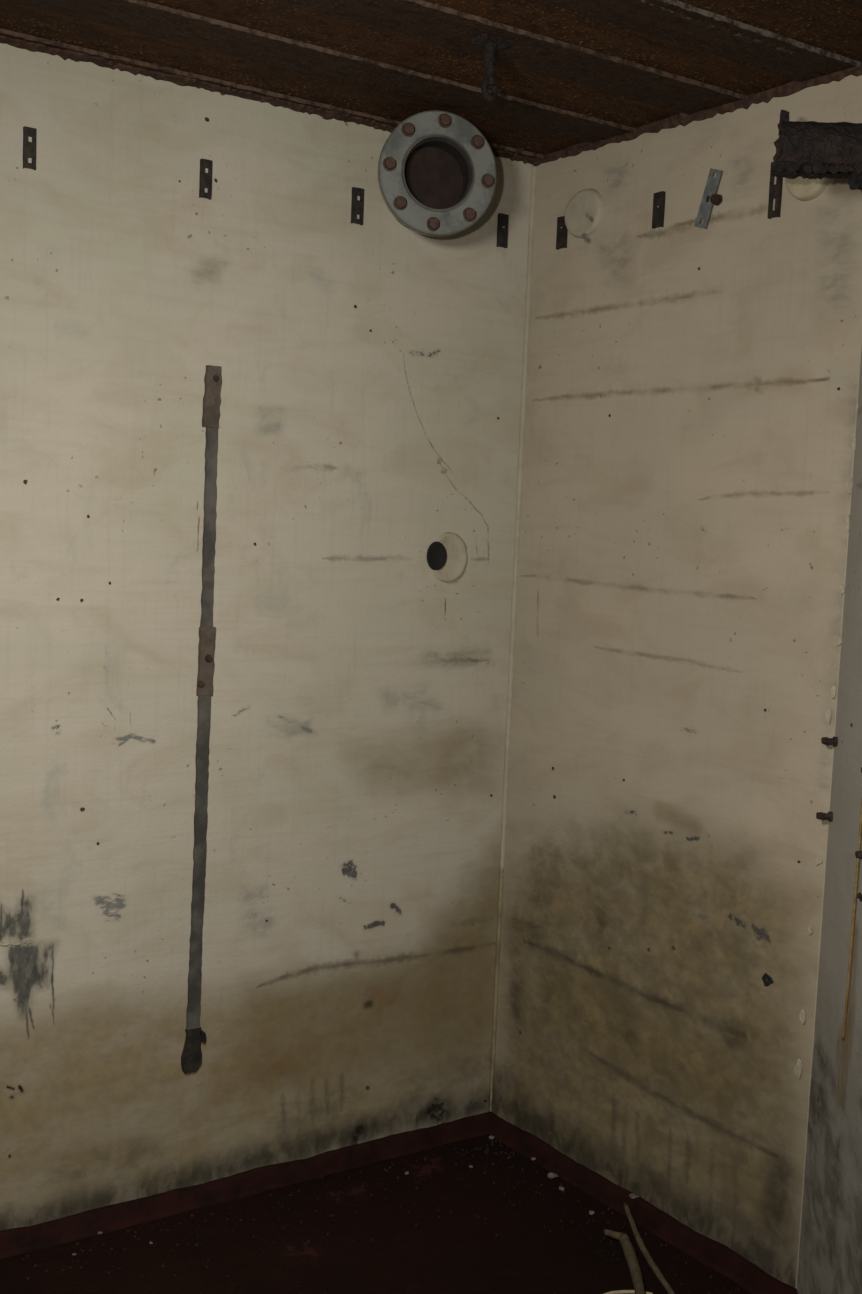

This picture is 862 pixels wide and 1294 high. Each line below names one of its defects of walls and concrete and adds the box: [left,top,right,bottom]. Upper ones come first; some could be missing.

leakage [0,861,795,1288]